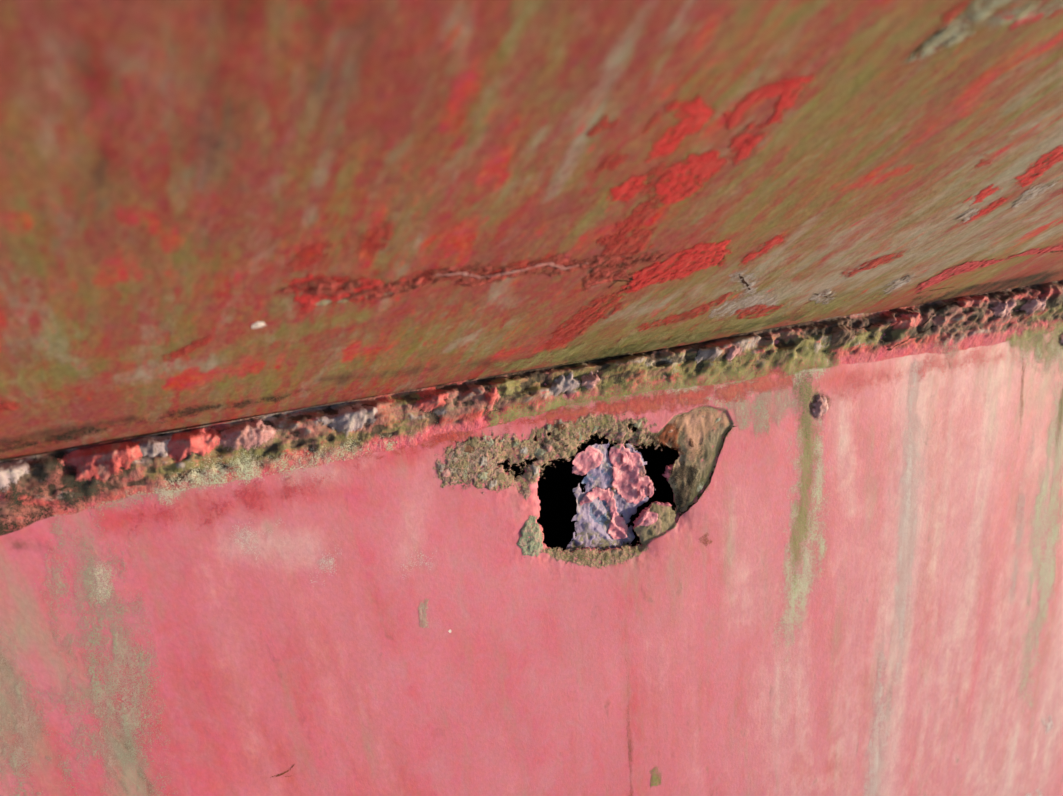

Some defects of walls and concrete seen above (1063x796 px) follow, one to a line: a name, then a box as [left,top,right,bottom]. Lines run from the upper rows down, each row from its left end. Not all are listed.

peeling [932,0,1063,34]
peeling [543,74,816,352]
peeling [958,144,1063,225]
crack [274,218,670,314]
peeling [840,249,906,278]
peeling [883,268,960,295]
spalling [348,366,795,551]
water stain [1006,319,1063,623]
water stain [862,358,928,796]